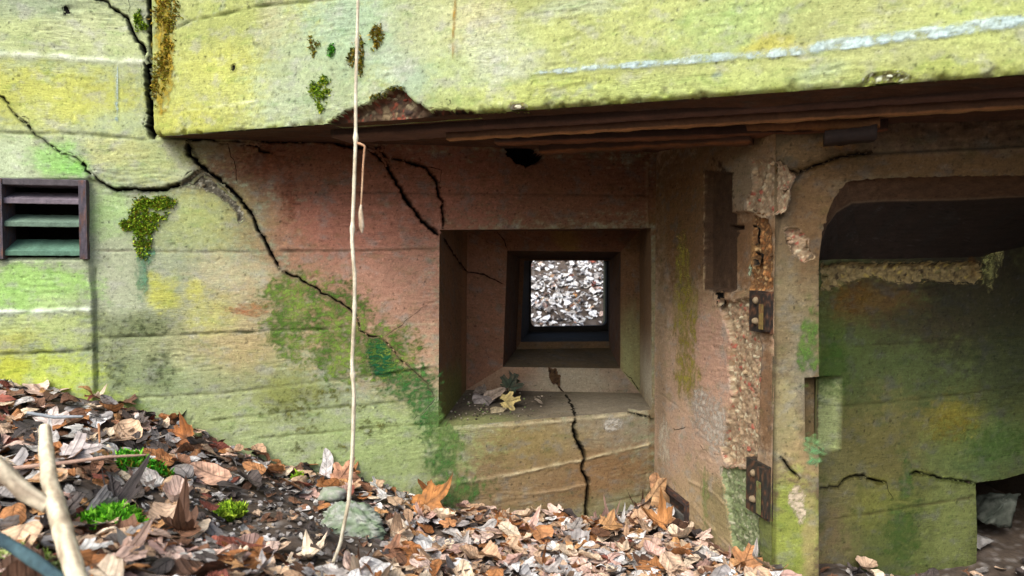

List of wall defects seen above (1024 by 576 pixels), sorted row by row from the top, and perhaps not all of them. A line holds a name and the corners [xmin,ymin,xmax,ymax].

spalling [328,85,482,124]
crack [0,0,503,418]
leakage [259,389,387,436]
crack [558,386,592,517]
spalling [713,156,983,558]
crack [778,454,976,499]